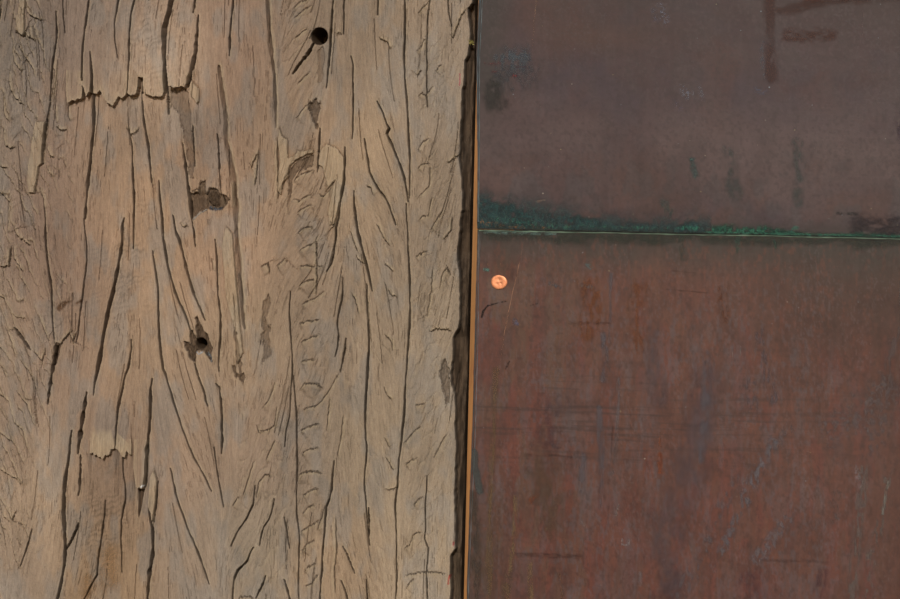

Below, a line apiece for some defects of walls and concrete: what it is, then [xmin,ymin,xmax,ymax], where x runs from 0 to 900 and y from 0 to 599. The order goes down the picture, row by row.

crack [15,328,31,350]
crack [42,0,96,405]
crack [57,0,246,599]
crack [231,300,369,599]
crack [265,0,453,599]
leakage [477,199,900,246]